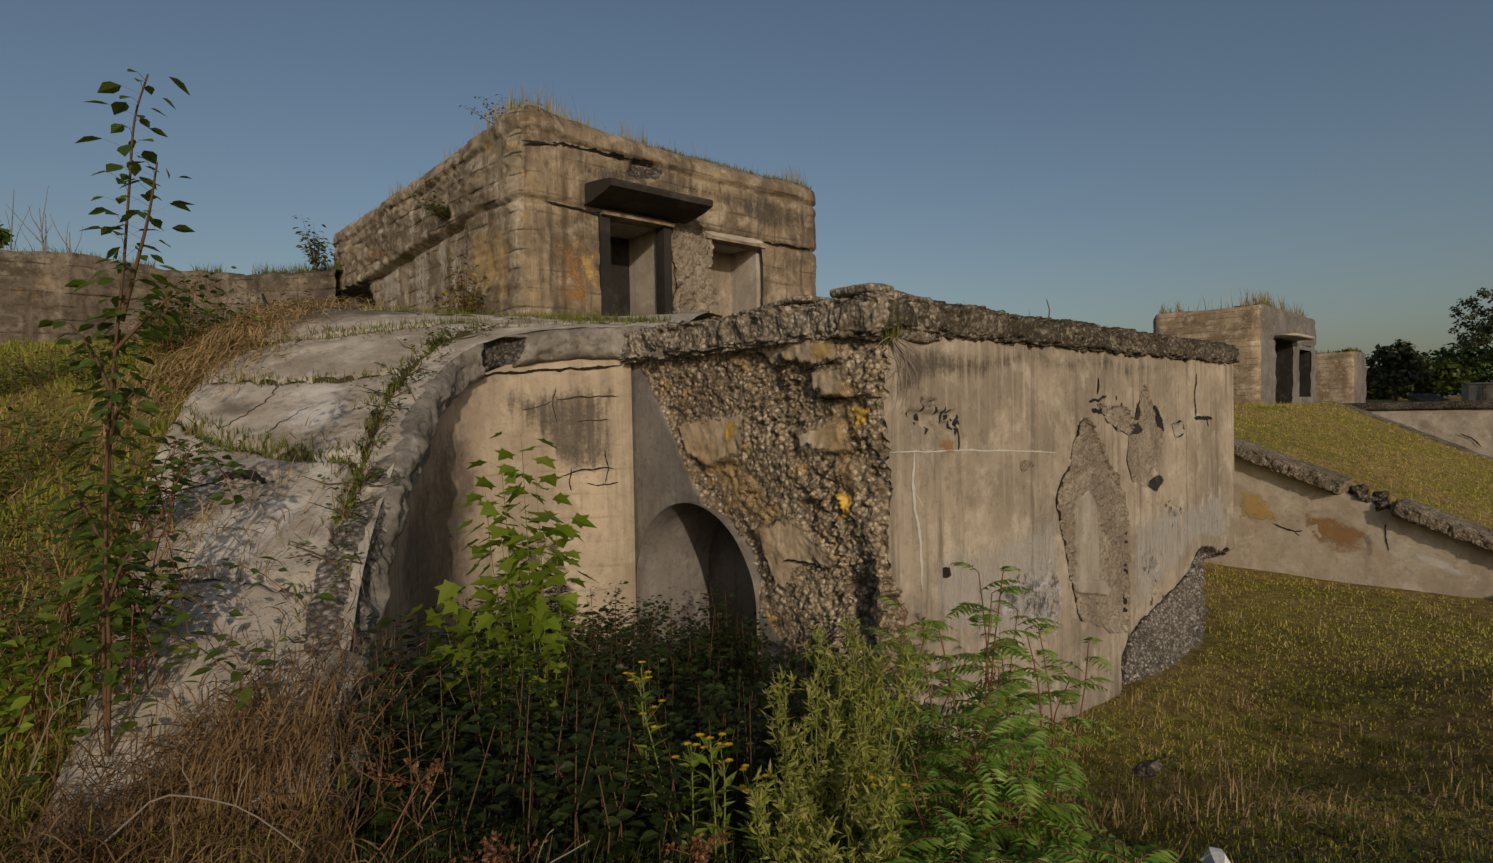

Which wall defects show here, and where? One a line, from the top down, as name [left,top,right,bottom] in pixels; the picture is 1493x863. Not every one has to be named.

crack [482,364,623,491]
spalling [637,338,916,759]
spalling [905,397,960,450]
flaking render [989,384,1231,692]